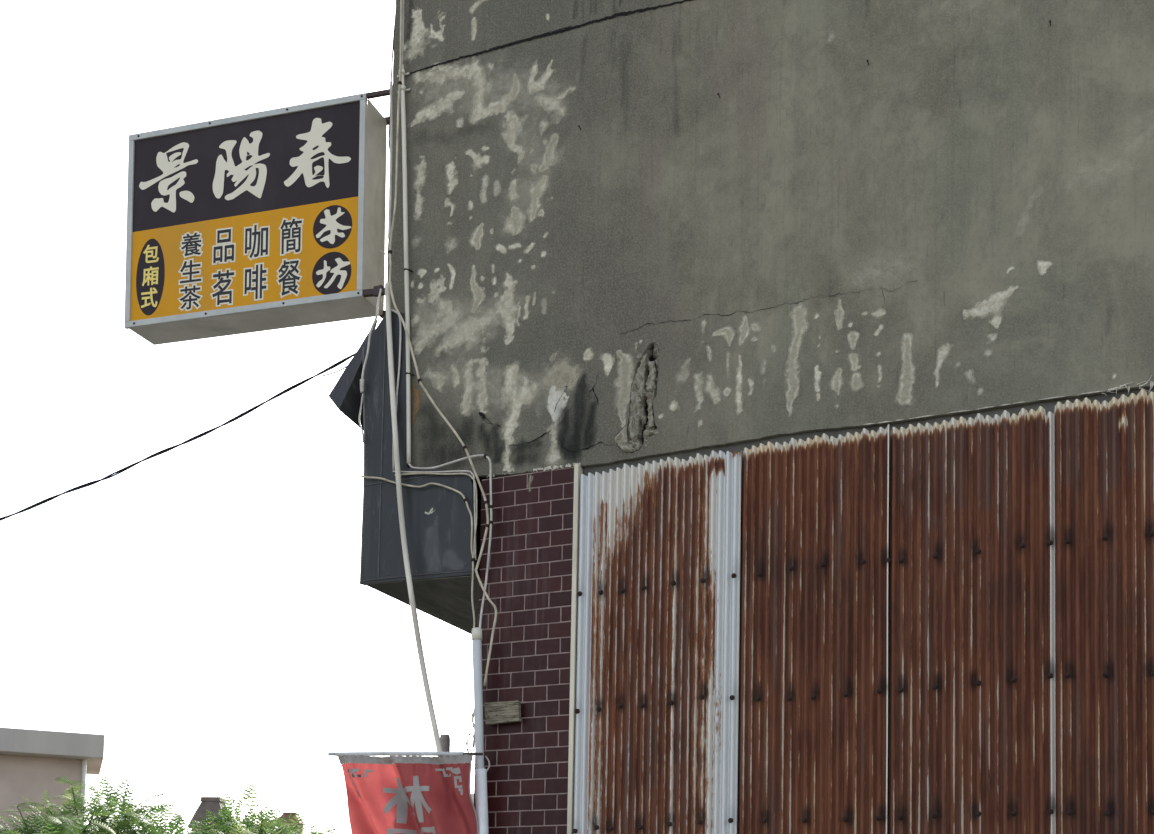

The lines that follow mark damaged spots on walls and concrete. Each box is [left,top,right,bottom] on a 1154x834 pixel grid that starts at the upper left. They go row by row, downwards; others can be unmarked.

crack [410,0,690,74]
peeling [547,385,569,426]
spalling [614,341,659,453]
peeling [1040,375,1154,400]